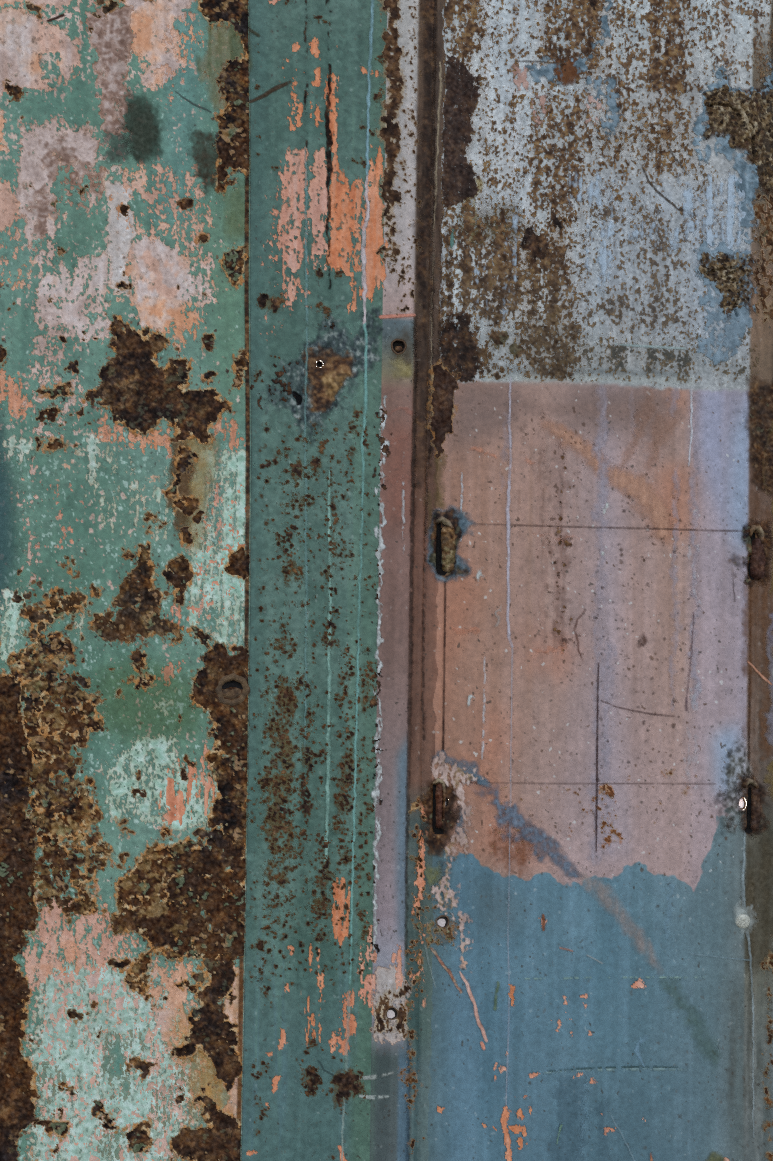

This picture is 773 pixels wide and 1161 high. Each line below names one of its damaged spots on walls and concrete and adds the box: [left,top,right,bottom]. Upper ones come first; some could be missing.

peeling [262,37,415,434]
peeling [0,0,217,670]
peeling [164,416,250,646]
corrosion [429,509,468,578]
corrosion [731,520,772,674]
peeling [22,880,209,1161]
peeling [223,965,243,1051]
corrosion [370,779,462,1109]
peeling [482,1095,532,1161]
corrosion [568,784,623,848]
corrosion [739,776,773,973]
corrosion [761,987,773,1161]